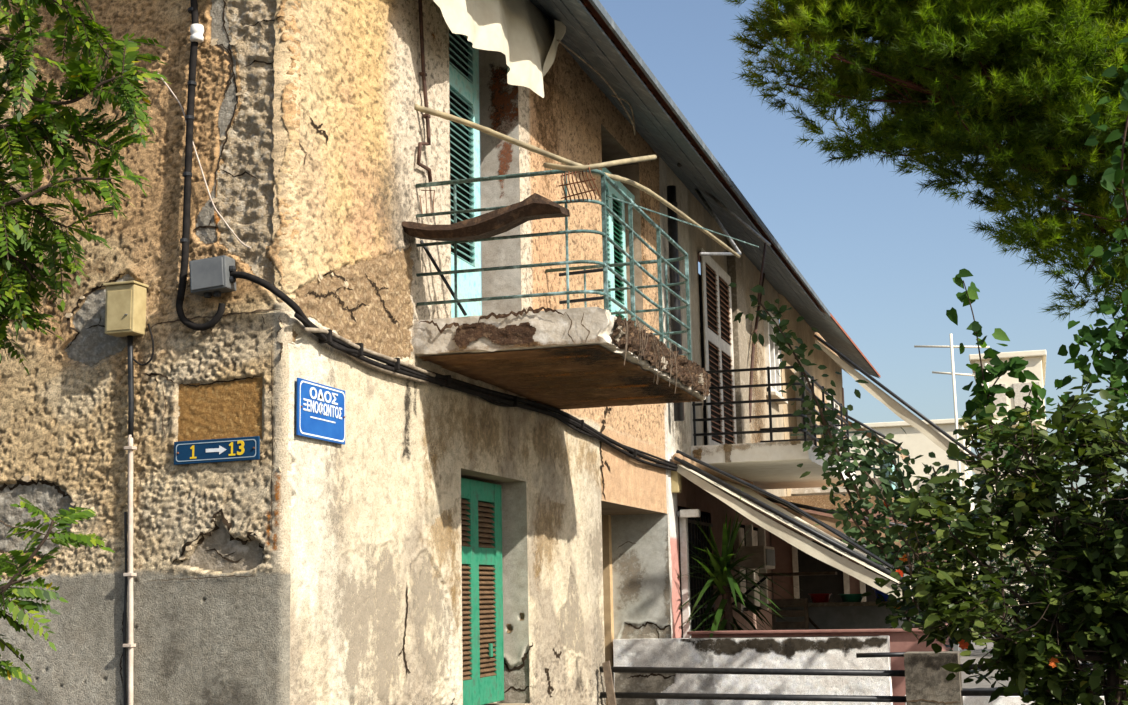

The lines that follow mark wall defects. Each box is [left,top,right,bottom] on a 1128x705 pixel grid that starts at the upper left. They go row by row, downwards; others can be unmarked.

crack [221,164,259,181]
spalling [196,0,566,359]
spalling [64,273,139,366]
crack [151,273,400,539]
crack [600,406,613,500]
spalling [0,475,75,556]
spalling [172,509,264,573]
crack [399,587,411,681]
crack [504,649,567,705]
leakage [681,636,887,660]